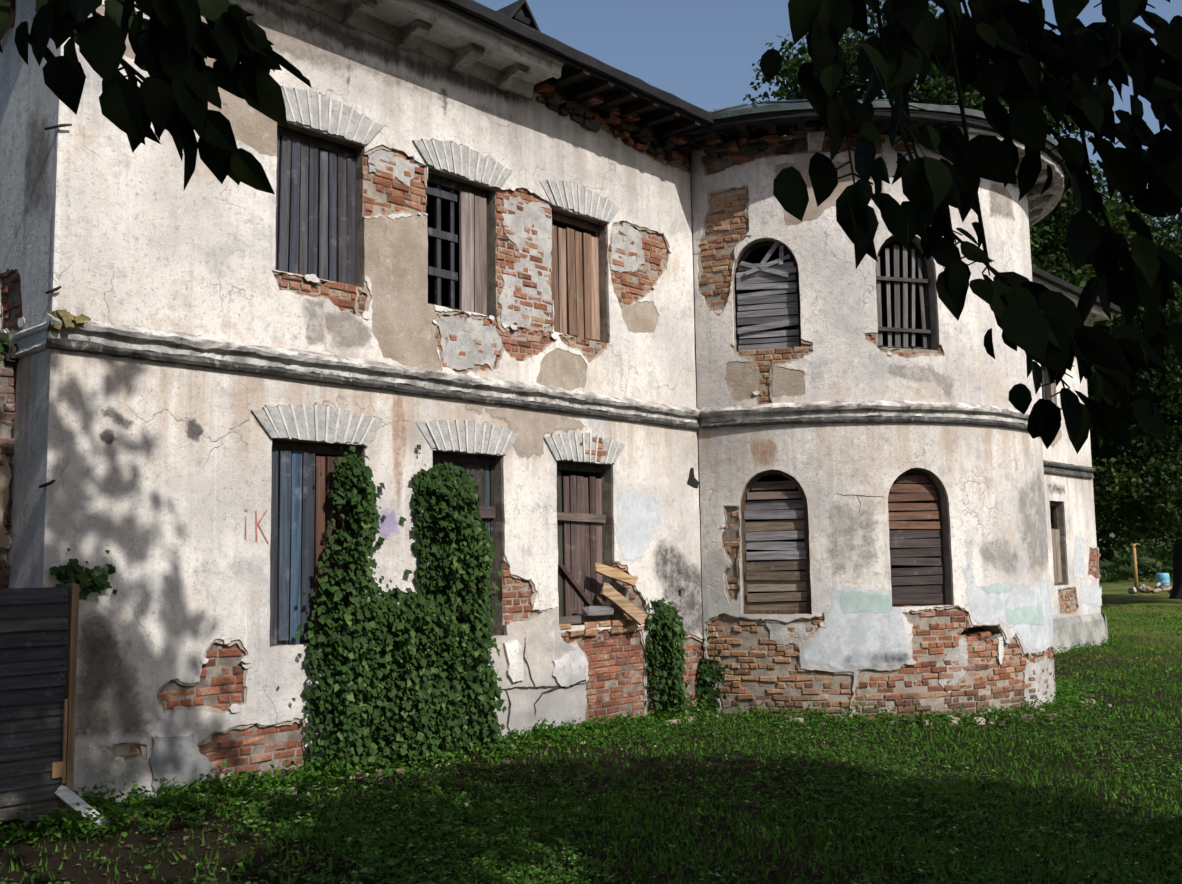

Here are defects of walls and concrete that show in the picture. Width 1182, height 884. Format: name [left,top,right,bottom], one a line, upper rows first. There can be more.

peeling [208,87,277,157]
peeling [540,90,884,226]
flaking render [0,270,25,335]
peeling [272,143,610,391]
flaking render [599,221,674,333]
flaking render [692,185,752,313]
flaking render [501,550,552,634]
damp [657,545,703,634]
flaking render [561,505,1055,727]
damp [75,617,150,802]
flaking render [157,636,309,789]
crack [502,637,586,739]